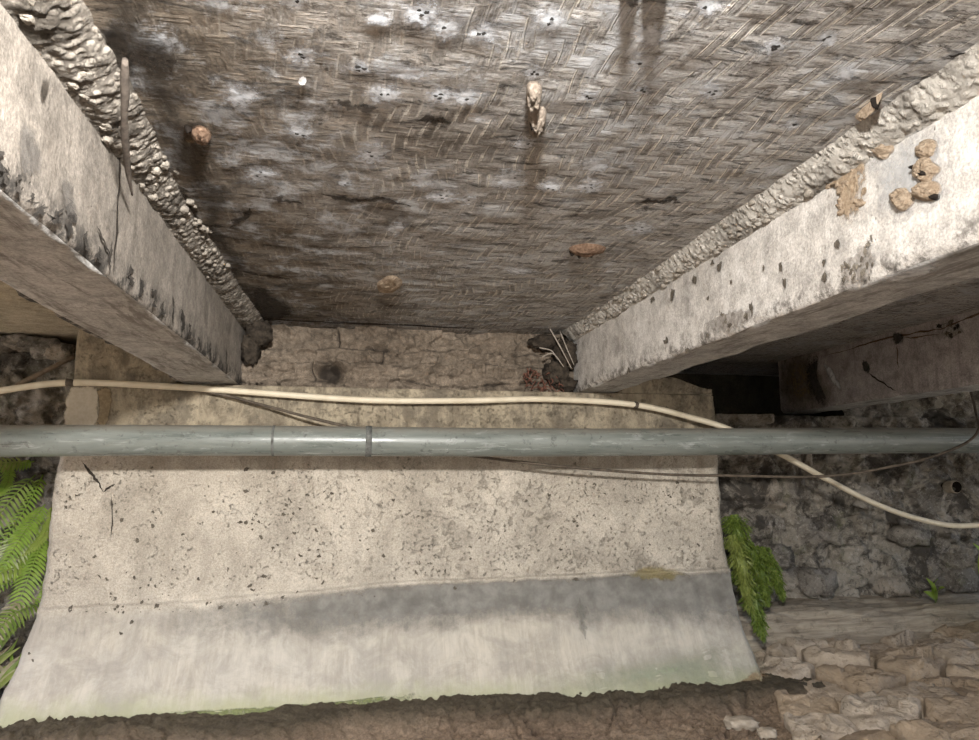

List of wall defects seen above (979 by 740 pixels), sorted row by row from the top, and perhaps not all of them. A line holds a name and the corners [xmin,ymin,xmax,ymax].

damp [0,128,113,269]
crack [178,185,411,228]
crack [639,196,681,204]
corrosion [825,163,867,216]
damp [127,264,211,357]
crack [82,462,115,540]
damp [244,573,739,629]